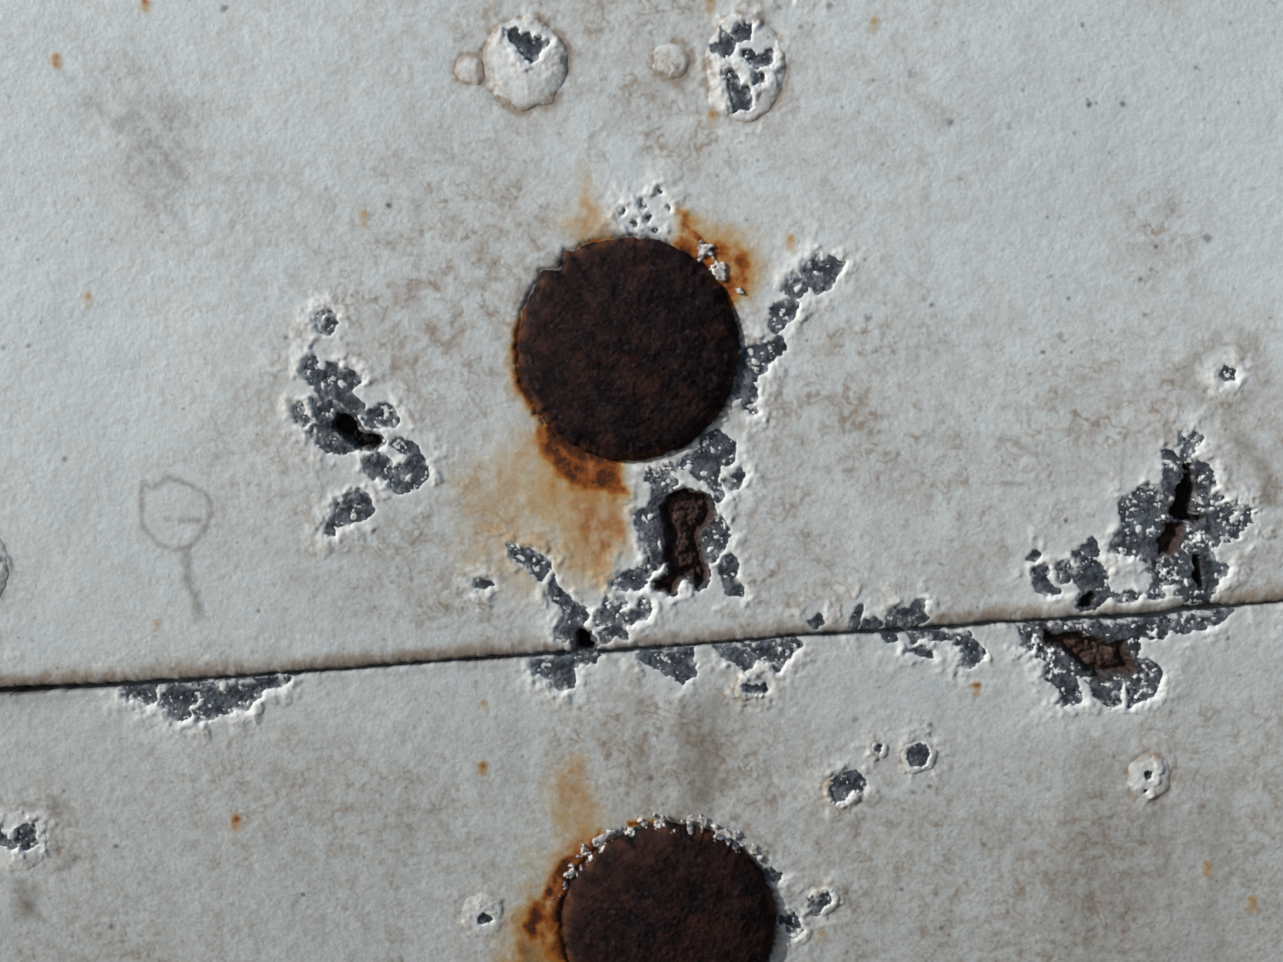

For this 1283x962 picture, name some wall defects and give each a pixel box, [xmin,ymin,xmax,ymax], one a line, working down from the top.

peeling [508,27,550,63]
peeling [709,23,774,114]
corrosion [672,209,755,309]
peeling [726,255,846,415]
peeling [293,356,429,537]
corrosion [498,316,630,578]
peeling [120,673,295,722]
peeling [507,427,825,694]
peeling [849,599,986,669]
peeling [1015,432,1255,709]
corrosion [501,761,610,962]
corrosion [626,818,655,827]